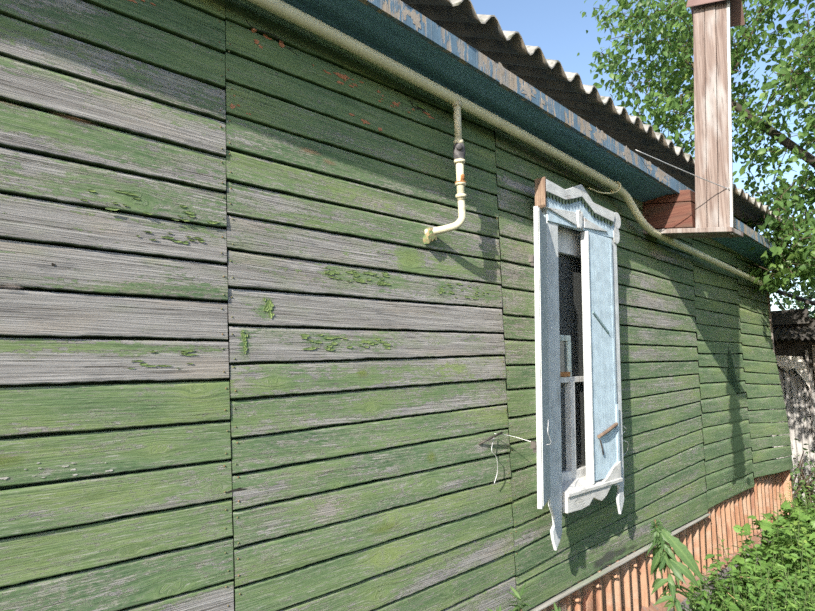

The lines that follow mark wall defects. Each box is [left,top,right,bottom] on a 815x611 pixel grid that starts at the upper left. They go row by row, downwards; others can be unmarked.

peeling [402,7,421,32]
peeling [497,62,545,105]
peeling [588,126,607,143]
peeling [647,161,667,182]
damp [726,350,750,484]